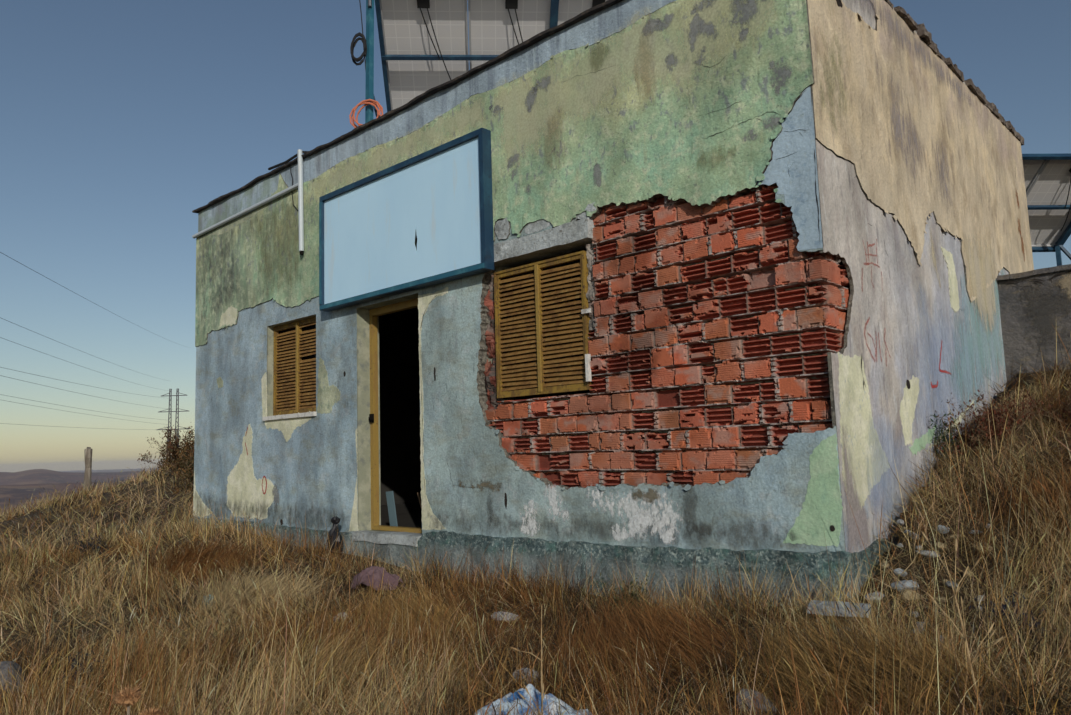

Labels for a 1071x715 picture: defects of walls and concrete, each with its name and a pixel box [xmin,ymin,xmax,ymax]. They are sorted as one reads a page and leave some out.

flaking render [836,0,879,29]
water stain [313,0,770,192]
flaking render [193,86,1009,553]
water stain [514,486,569,536]
water stain [588,488,711,544]